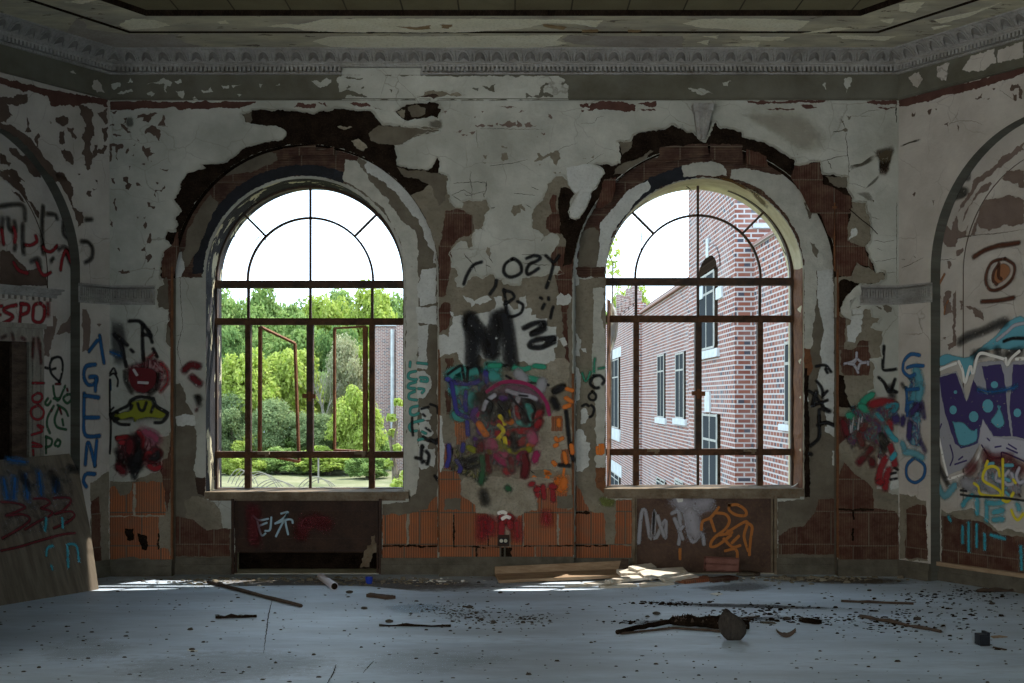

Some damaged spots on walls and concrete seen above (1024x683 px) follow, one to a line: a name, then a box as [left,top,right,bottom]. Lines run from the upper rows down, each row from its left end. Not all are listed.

peeling [867,42,1024,117]
crack [824,104,897,187]
flaking render [0,74,1024,573]